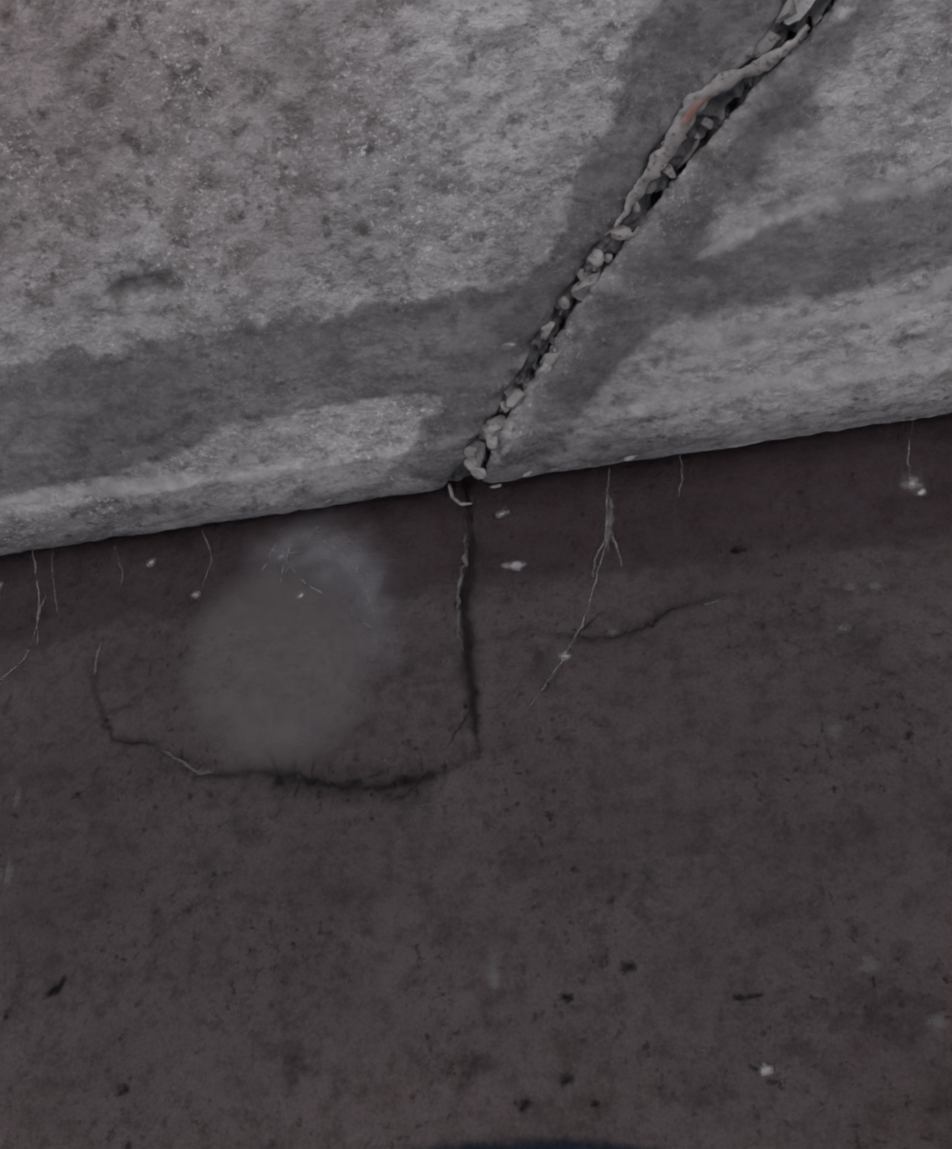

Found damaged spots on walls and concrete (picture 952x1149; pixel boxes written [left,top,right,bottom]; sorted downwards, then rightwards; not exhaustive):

crack [451,502,478,741]